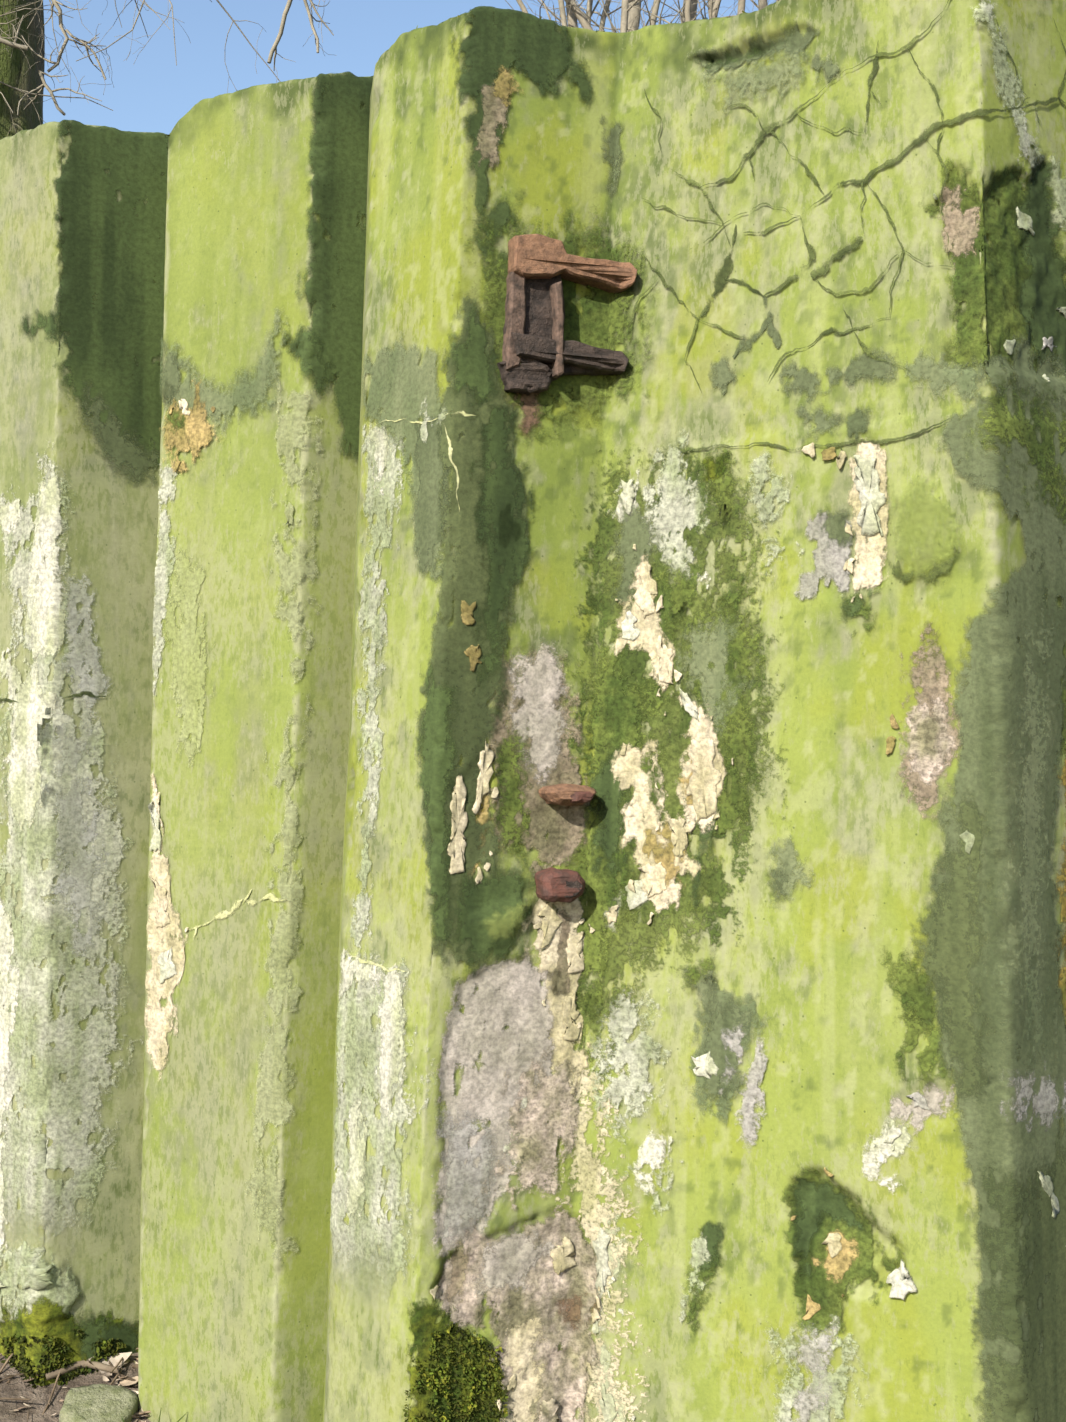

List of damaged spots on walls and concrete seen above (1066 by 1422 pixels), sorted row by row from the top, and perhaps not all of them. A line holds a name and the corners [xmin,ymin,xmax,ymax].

corrosion [474,210,651,441]
crack [628,0,1066,393]
spalling [924,0,1066,407]
peeling [748,442,889,603]
peeling [0,452,188,1322]
spalling [330,423,733,1422]
peeling [691,1027,768,1145]
spalling [886,624,963,818]